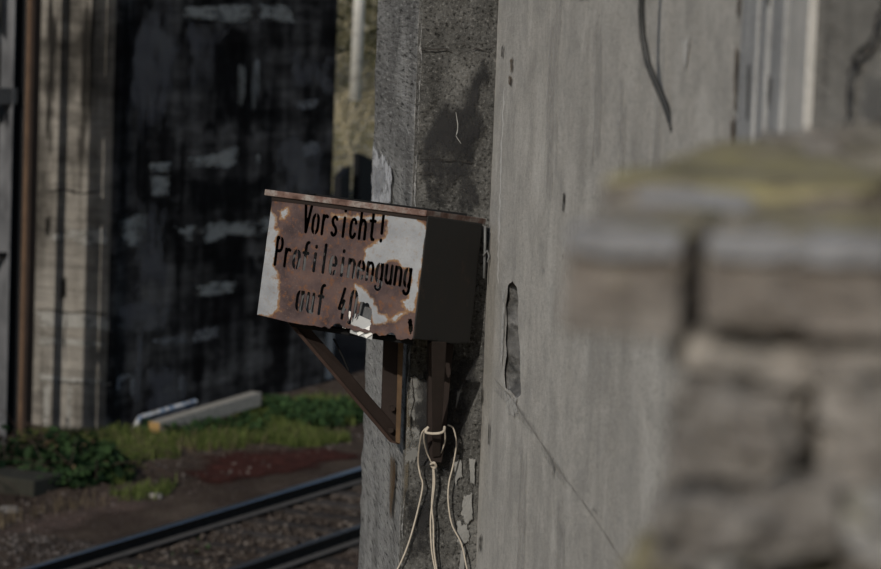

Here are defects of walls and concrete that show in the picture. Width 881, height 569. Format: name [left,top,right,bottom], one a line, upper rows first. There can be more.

crack [843,0,881,125]
spalling [504,281,521,398]